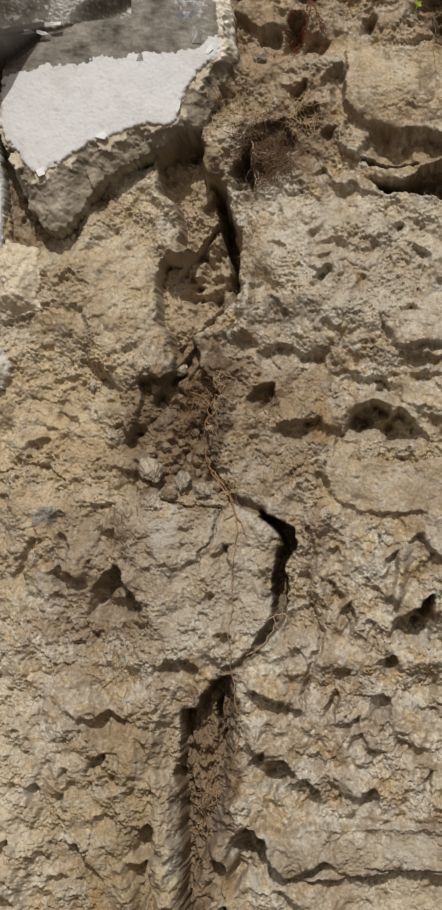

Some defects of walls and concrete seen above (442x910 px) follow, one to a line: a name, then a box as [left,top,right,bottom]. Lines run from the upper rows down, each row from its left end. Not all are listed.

spalling [0,0,240,240]
crack [137,143,326,910]